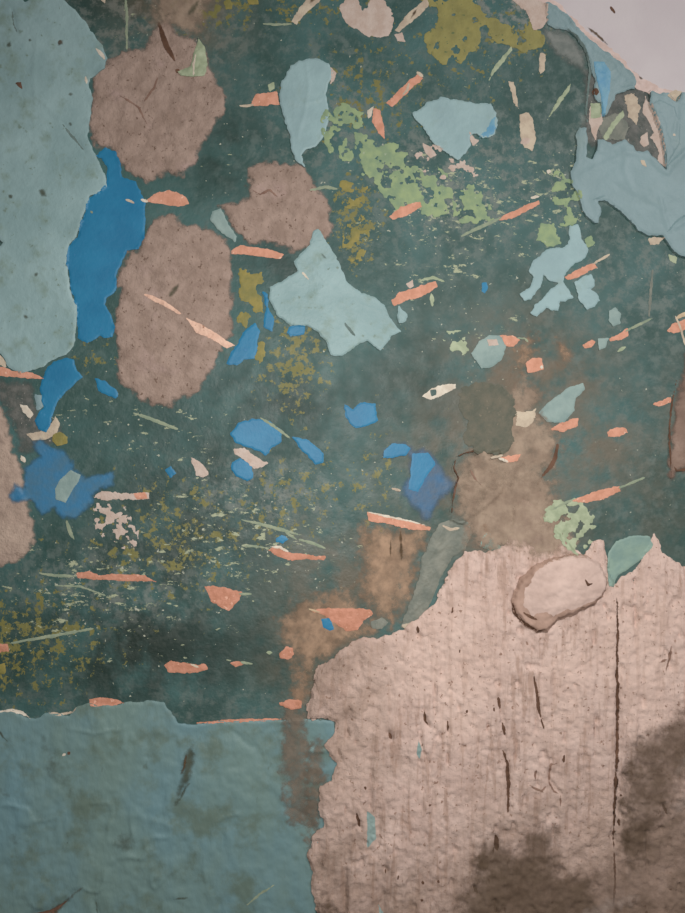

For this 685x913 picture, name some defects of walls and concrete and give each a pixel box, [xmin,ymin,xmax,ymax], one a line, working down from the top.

peeling [339,0,429,42]
peeling [0,0,226,379]
spalling [95,58,444,407]
peeling [412,97,498,172]
peeling [520,224,610,317]
peeling [508,0,685,264]
spalling [0,407,35,567]
peeling [515,383,585,432]
spalling [0,533,685,913]
crack [612,601,620,904]
water stain [629,722,685,805]
water stain [465,836,589,913]